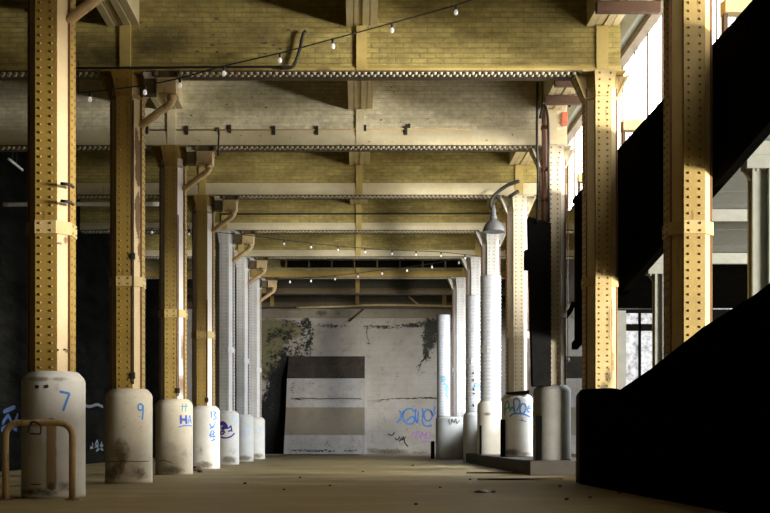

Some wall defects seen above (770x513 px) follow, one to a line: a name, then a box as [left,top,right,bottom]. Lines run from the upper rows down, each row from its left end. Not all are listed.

leakage [261,318,314,386]